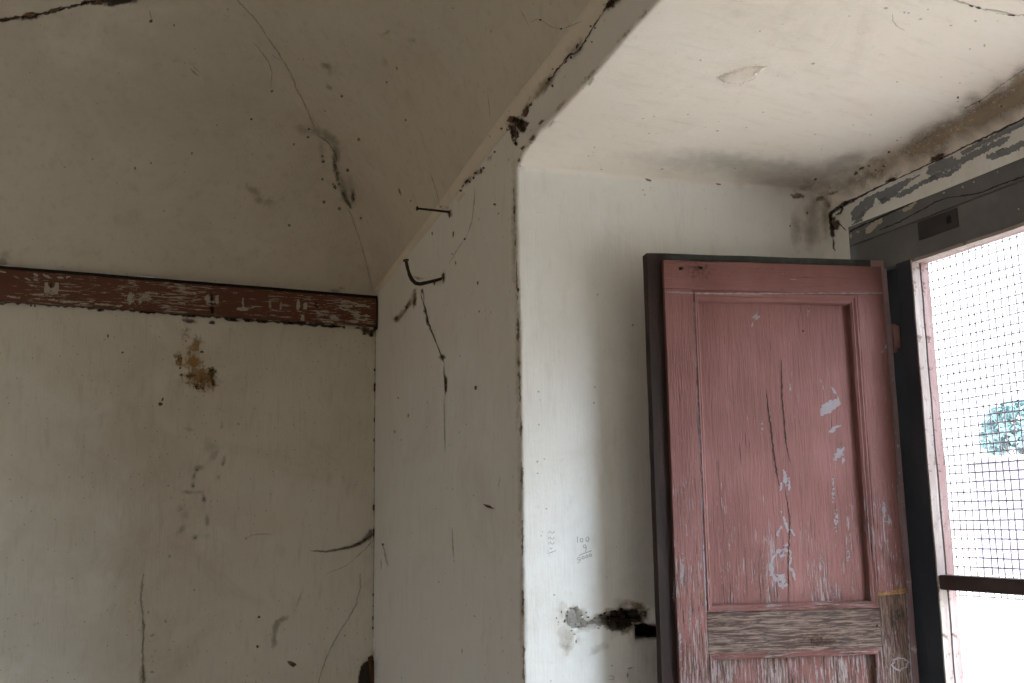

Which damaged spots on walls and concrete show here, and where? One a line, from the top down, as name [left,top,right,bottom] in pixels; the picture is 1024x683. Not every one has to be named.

crack [0,0,136,22]
crack [541,0,619,90]
water stain [853,73,1024,179]
peeling [832,119,1024,238]
spalling [0,302,374,337]
rust [174,338,216,390]
crack [421,296,447,391]
spalling [556,603,656,643]